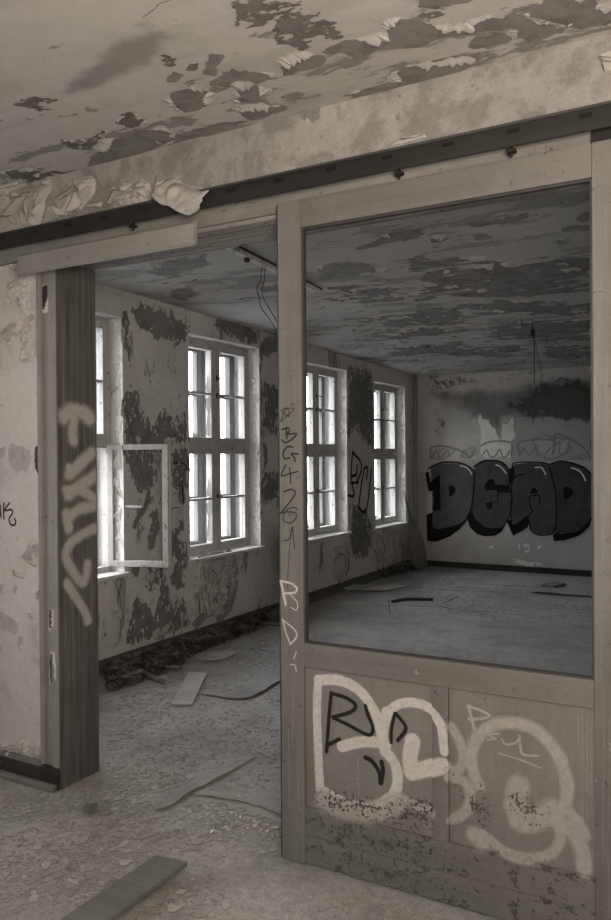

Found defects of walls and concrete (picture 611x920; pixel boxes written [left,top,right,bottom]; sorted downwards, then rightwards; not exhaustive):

peeling [14,96,58,112]
peeling [61,0,611,167]
peeling [0,168,77,183]
peeling [467,197,590,241]
peeling [306,216,591,390]
peeling [109,253,238,648]
peeling [214,318,279,538]
peeling [338,364,375,561]
peeling [398,388,406,517]
leakage [458,379,591,427]
peeling [513,543,542,567]